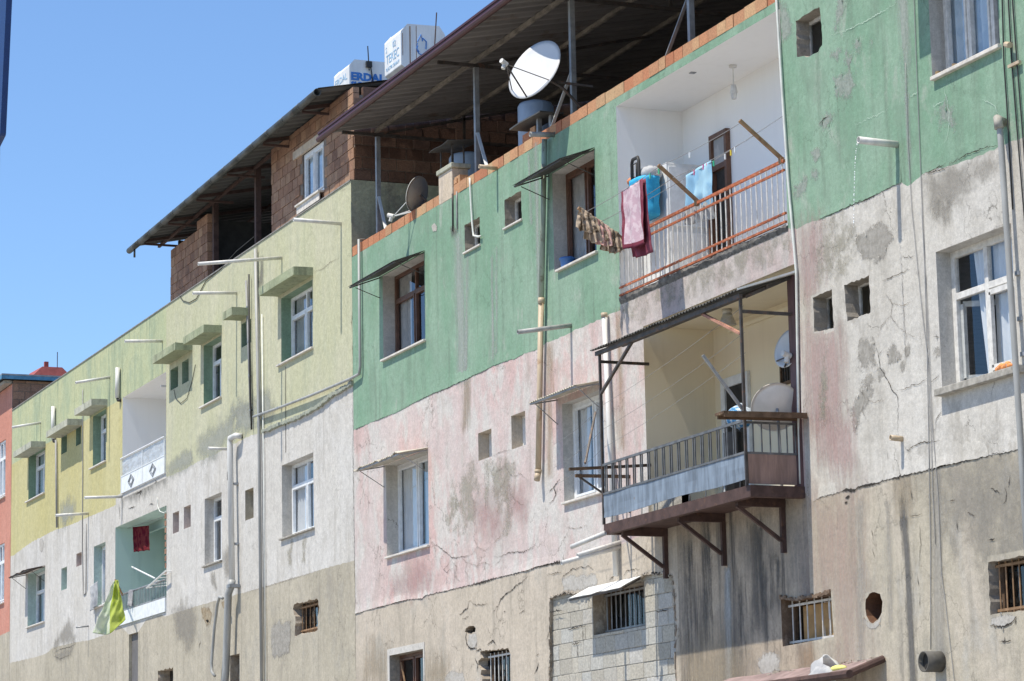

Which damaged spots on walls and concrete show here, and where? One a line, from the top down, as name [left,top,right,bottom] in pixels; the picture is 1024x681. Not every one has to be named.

peeling [856,222,893,264]
peeling [851,339,910,433]
crack [813,256,1018,606]
crack [354,525,609,668]